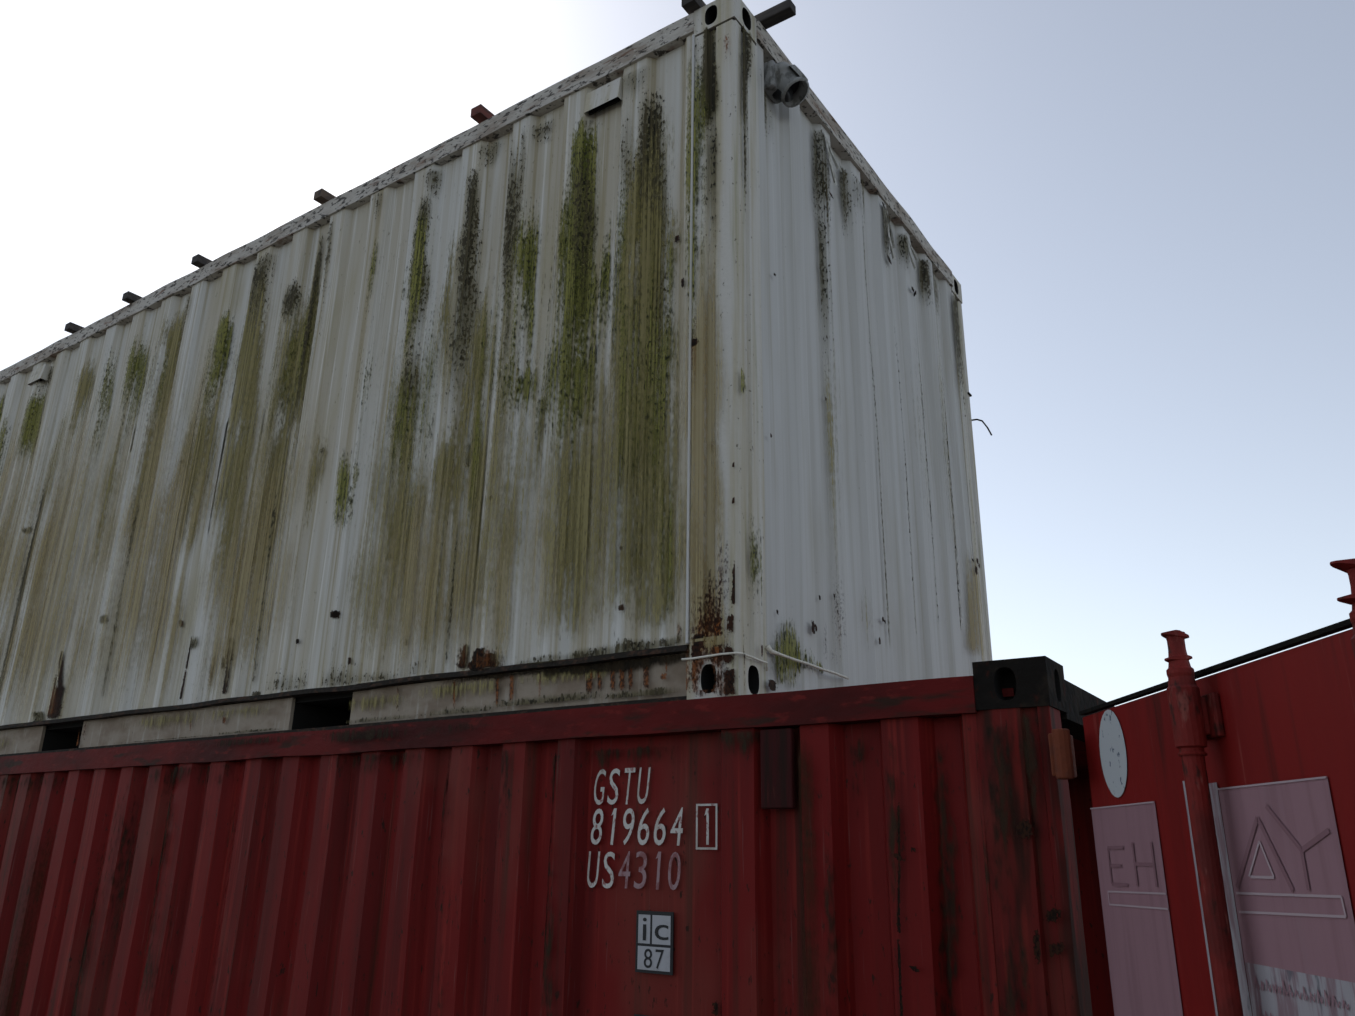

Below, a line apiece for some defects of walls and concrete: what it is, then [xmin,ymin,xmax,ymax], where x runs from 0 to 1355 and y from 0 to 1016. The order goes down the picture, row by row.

damp [0,221,333,693]
damp [348,27,719,663]
rust [417,279,745,716]